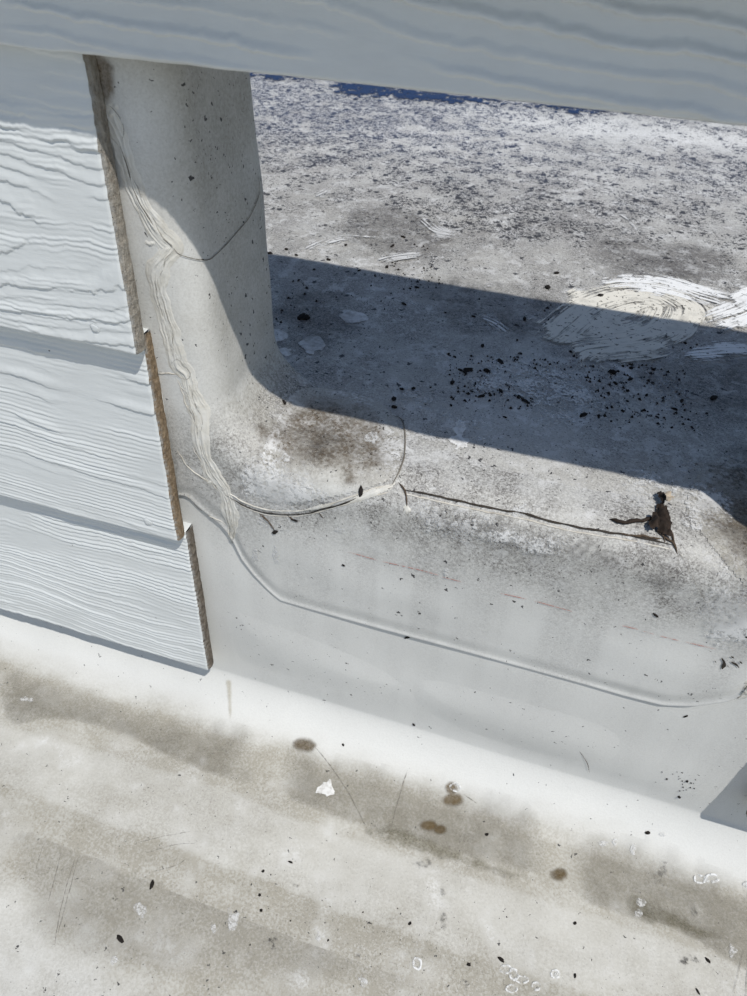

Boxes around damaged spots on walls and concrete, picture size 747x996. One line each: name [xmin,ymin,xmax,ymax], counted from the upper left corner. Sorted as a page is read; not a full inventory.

damp [260,404,380,466]
crack [227,415,688,568]